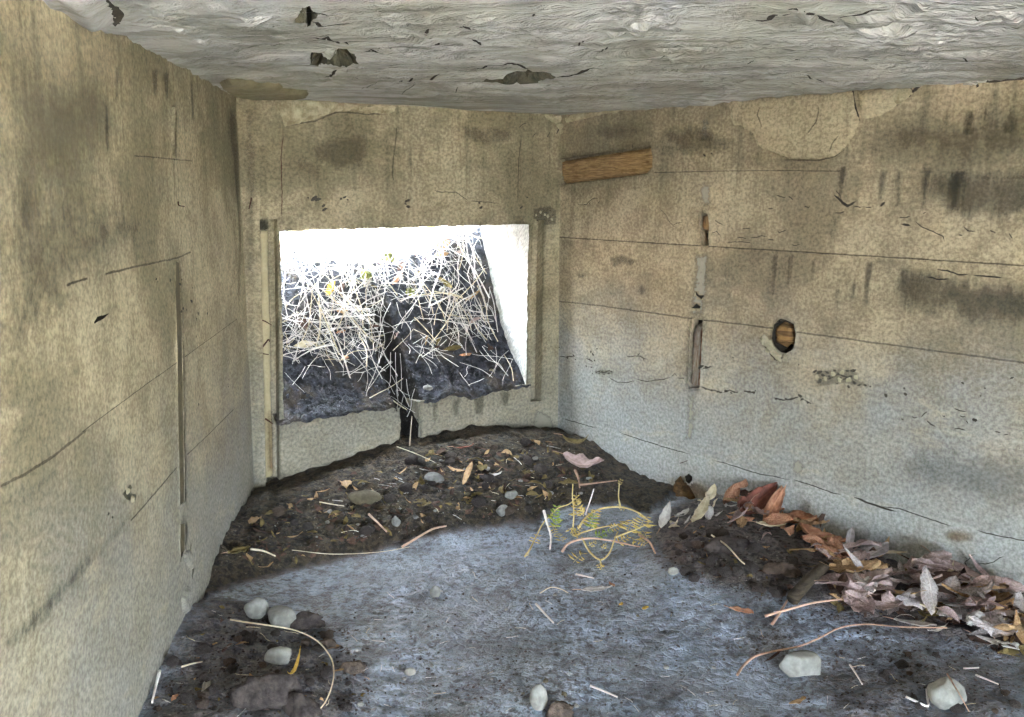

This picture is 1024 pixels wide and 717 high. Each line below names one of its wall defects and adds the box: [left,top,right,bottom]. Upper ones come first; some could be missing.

flaking render [295,6,470,80]
flaking render [468,5,720,89]
damp [923,170,1024,218]
damp [901,271,1024,318]
flaking render [815,370,858,383]